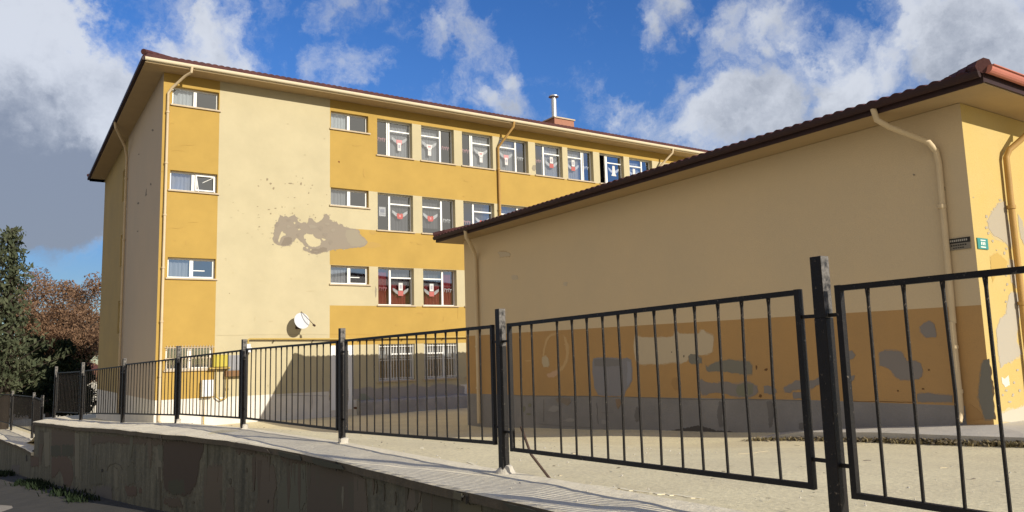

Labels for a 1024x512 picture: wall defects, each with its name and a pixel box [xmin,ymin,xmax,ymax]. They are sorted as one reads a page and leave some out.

spalling [247,175,377,255]
peeling [985,199,1024,422]